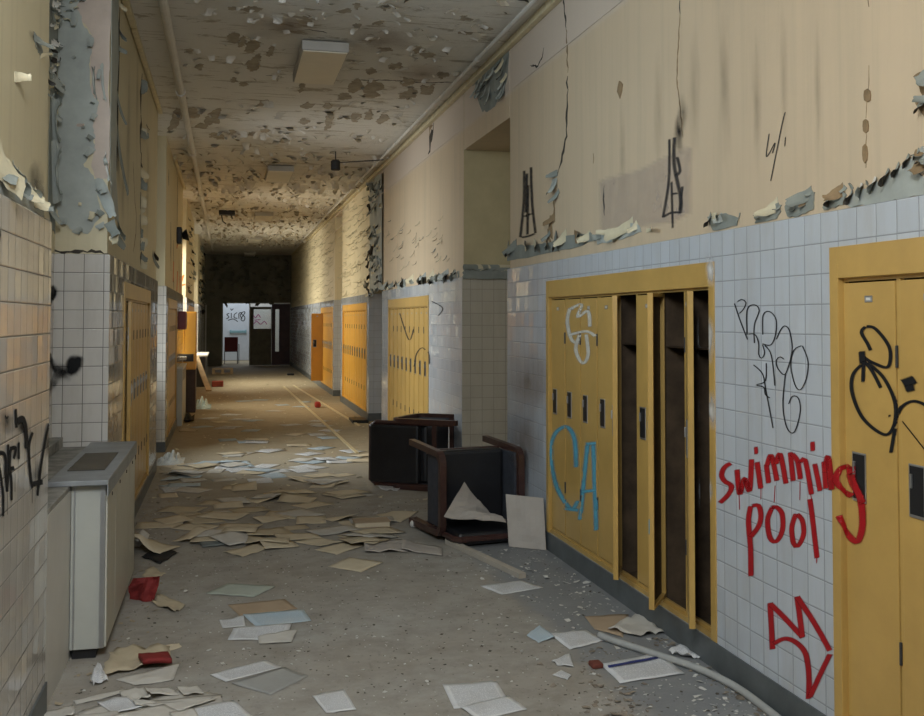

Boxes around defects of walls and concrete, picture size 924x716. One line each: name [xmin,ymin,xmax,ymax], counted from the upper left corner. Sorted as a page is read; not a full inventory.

peeling [0,0,129,254]
peeling [167,0,651,318]
crack [541,0,569,242]
crack [675,1,683,135]
peeling [703,212,741,230]
peeling [753,146,924,223]
peeling [912,70,924,116]